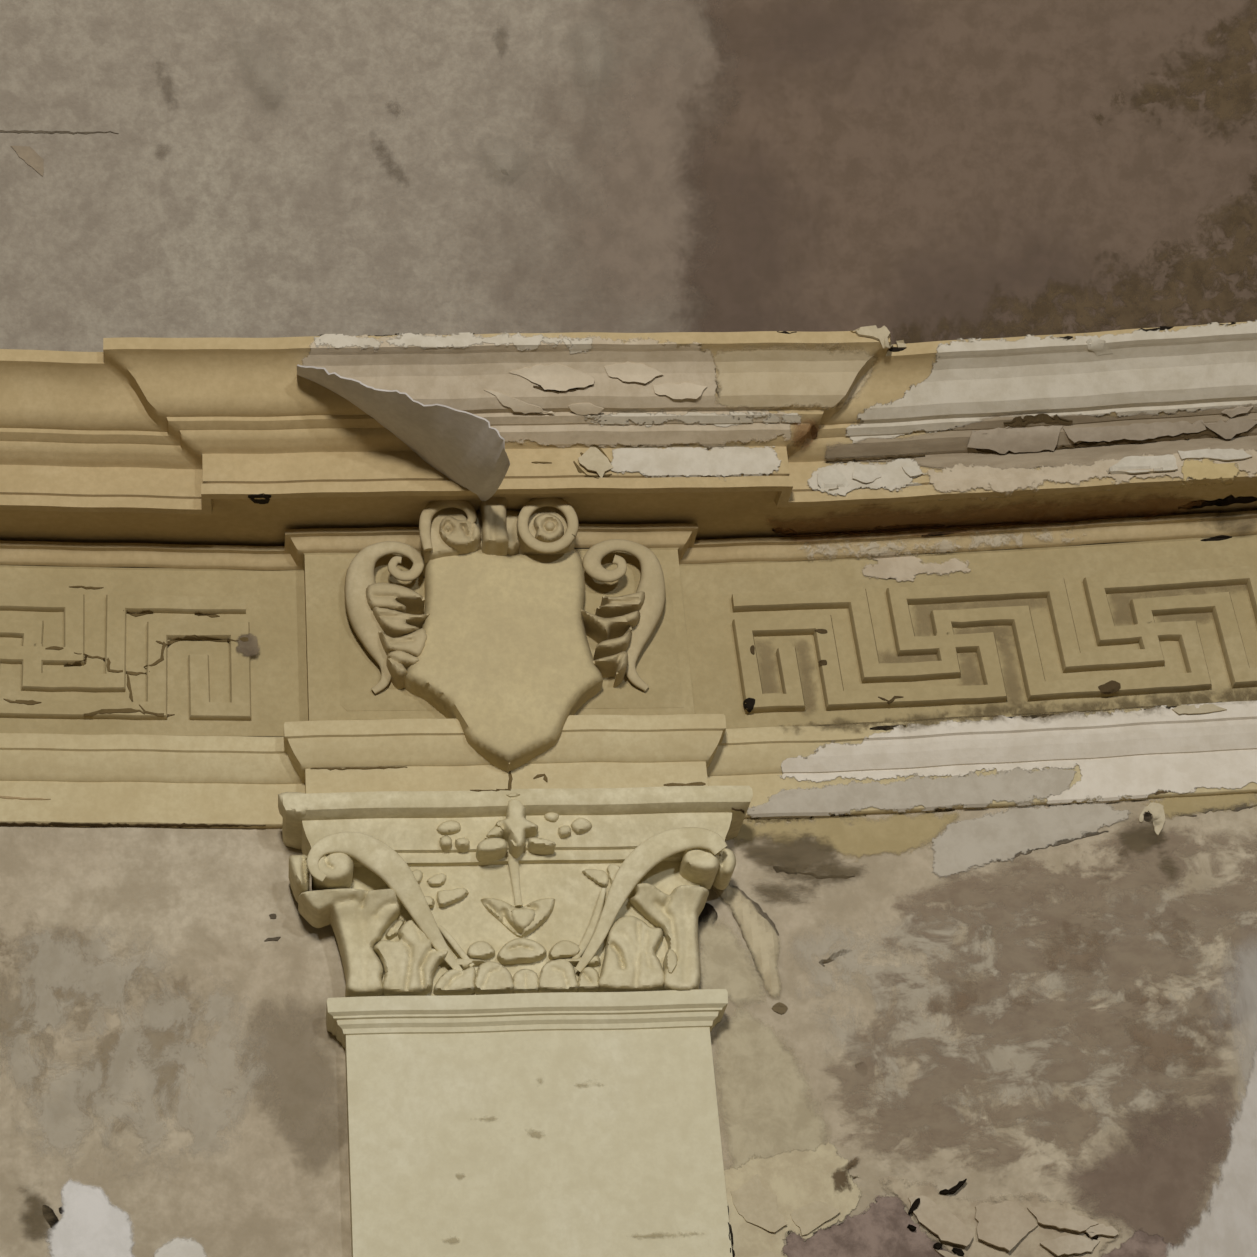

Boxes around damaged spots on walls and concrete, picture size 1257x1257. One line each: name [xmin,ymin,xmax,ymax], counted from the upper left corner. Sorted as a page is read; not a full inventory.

crack [0,128,119,136]
damp [575,0,1257,344]
peeling [297,325,906,501]
peeling [807,320,1257,501]
crack [3,698,41,706]
crack [45,586,248,716]
spalling [1098,680,1121,694]
damp [746,838,860,900]
flaking render [724,701,1257,1257]
damp [796,896,1257,1247]